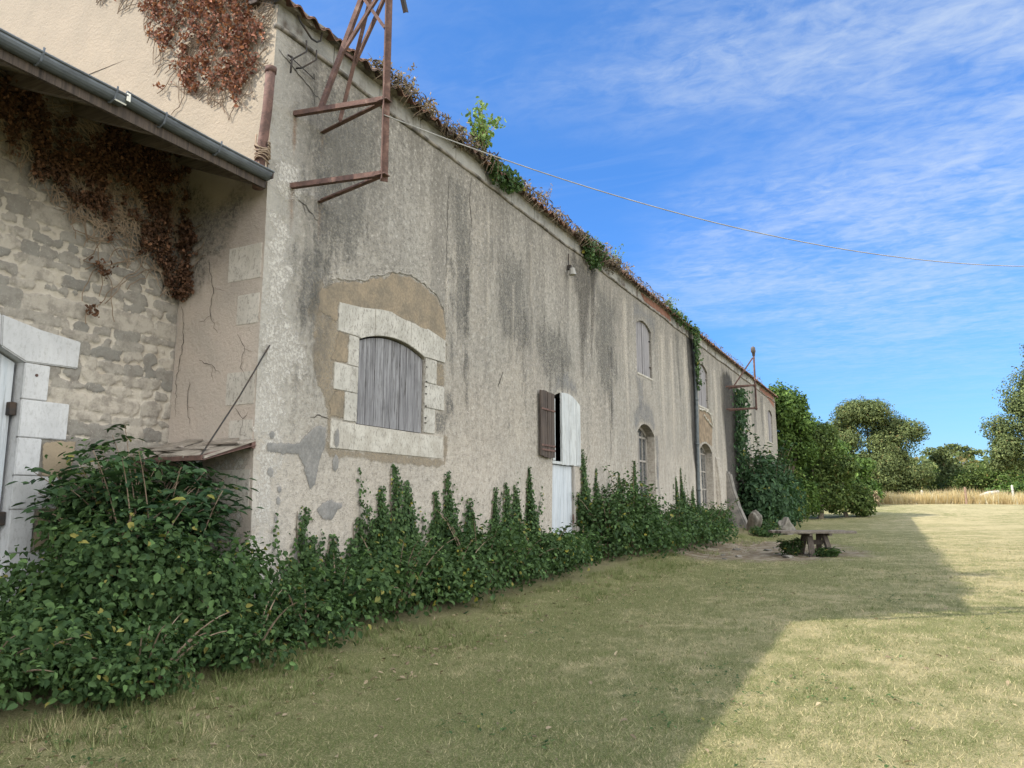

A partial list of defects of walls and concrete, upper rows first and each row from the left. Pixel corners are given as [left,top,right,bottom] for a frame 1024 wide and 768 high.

crack [175,262,249,424]
peeling [308,270,453,467]
damp [571,253,596,373]
damp [623,302,696,485]